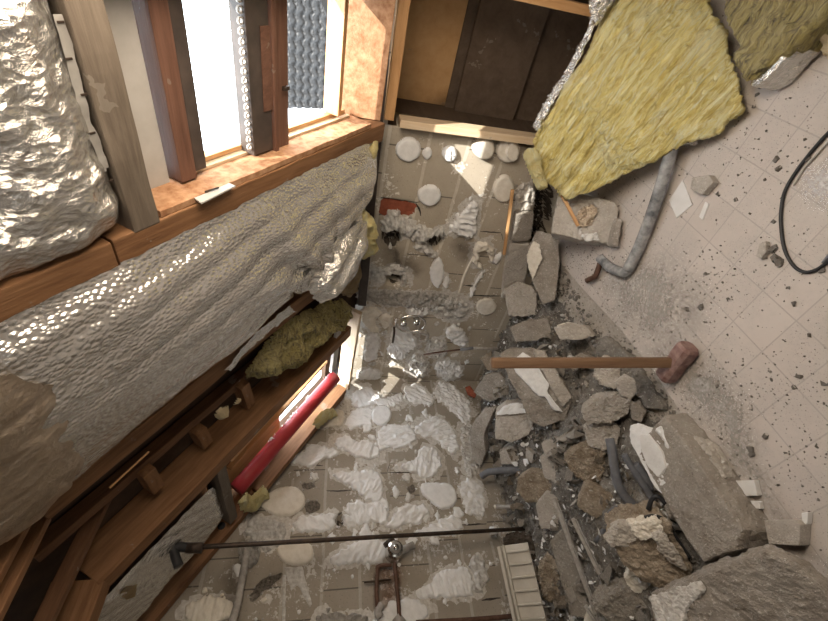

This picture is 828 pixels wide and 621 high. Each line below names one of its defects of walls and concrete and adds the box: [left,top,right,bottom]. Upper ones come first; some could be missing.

spalling [379,198,418,249]
spalling [514,182,554,241]
peeling [368,330,410,373]
peeling [293,461,321,490]
peeling [378,474,417,511]
peeling [352,522,375,536]